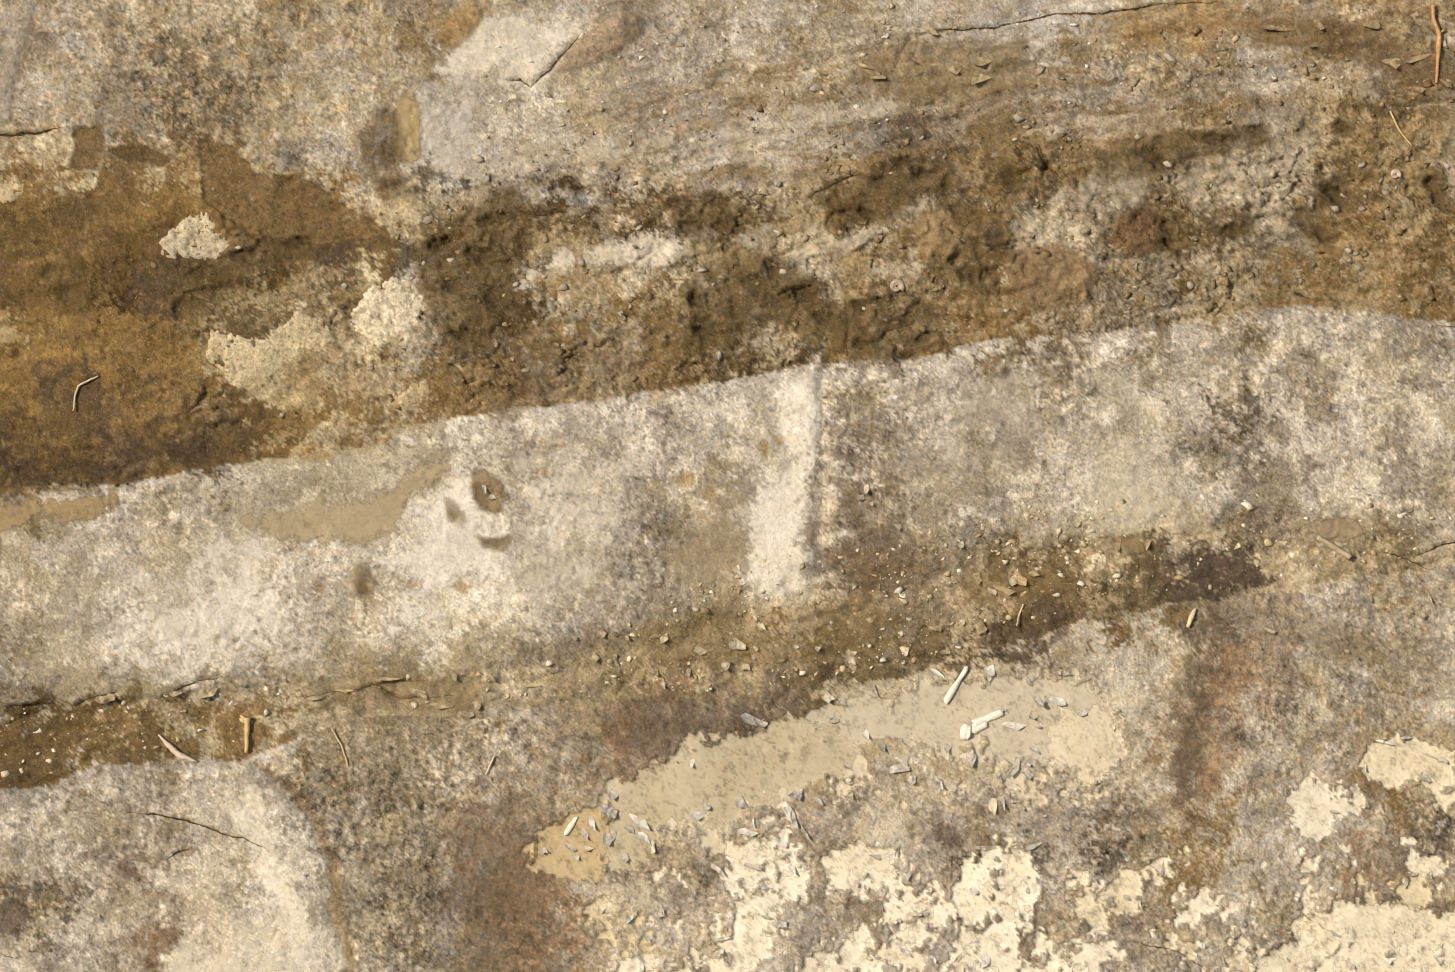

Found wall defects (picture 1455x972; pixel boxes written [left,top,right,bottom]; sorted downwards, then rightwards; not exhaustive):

crack [891,1,1223,74]
crack [0,128,57,137]
peeling [972,570,1040,595]
peeling [592,630,629,665]
peeling [686,622,766,677]
peeling [96,692,116,704]
peeling [168,680,246,698]
peeling [377,677,481,718]
peeling [521,650,1455,972]
crack [127,812,268,861]